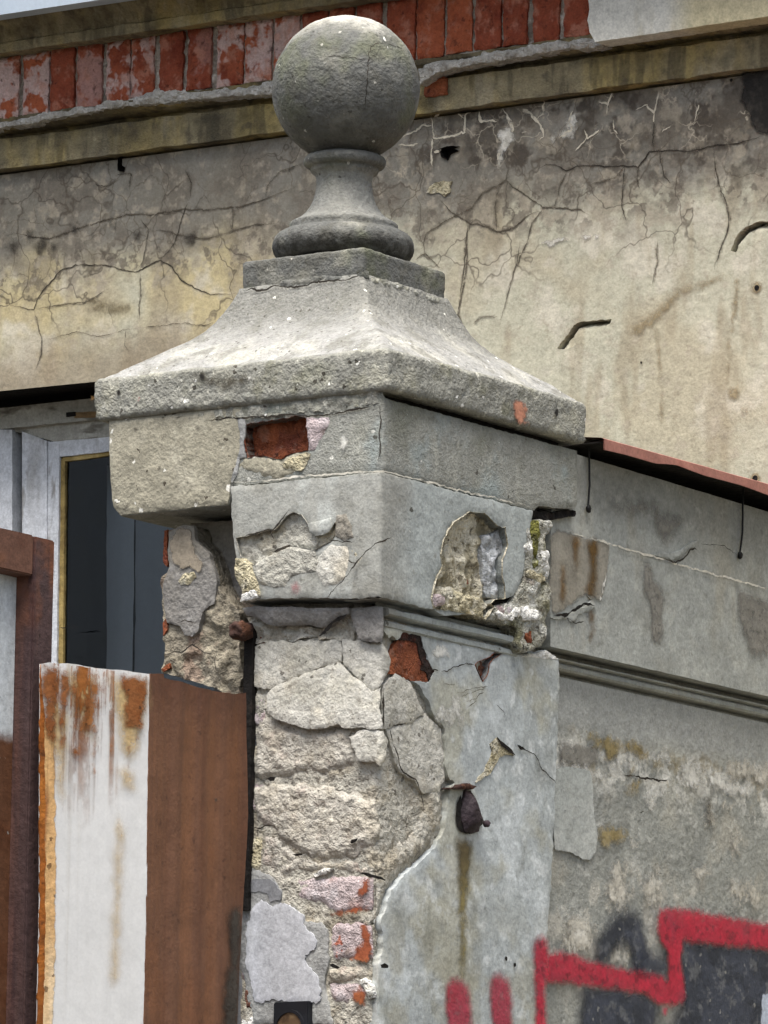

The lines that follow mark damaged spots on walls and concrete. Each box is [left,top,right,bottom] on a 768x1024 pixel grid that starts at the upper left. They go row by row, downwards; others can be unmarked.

crack [0,165,359,365]
crack [417,122,761,322]
spalling [239,416,330,479]
flaking render [163,525,220,637]
crack [244,510,291,552]
flaking render [234,512,362,603]
crack [327,538,390,598]
spalling [431,512,596,682]
flaking render [475,737,526,783]
corrosion [36,663,147,1024]
flaking render [251,632,445,1005]
spalling [242,972,253,1024]